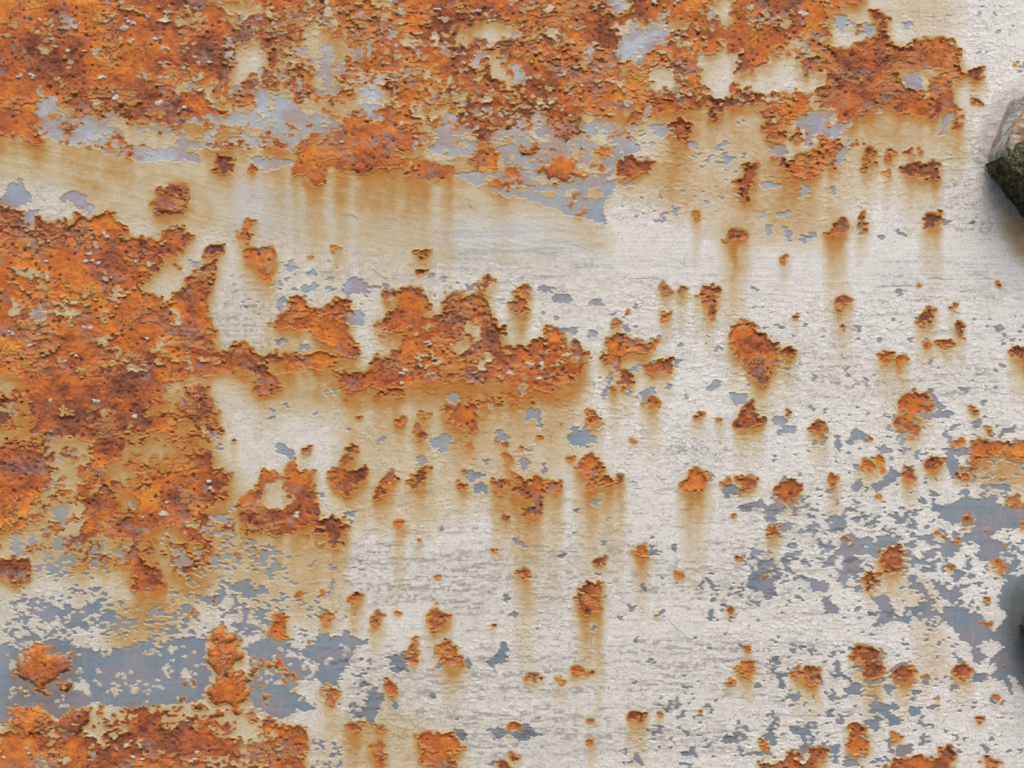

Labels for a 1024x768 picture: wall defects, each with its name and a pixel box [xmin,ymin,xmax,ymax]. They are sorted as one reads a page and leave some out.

peeling [60,191,95,216]
peeling [34,0,426,172]
rust [0,0,986,283]
peeling [746,4,780,26]
rust [0,174,675,647]
rust [658,280,722,326]
rust [692,318,798,440]
rust [902,404,1024,531]
rust [0,612,315,768]
peeling [0,503,411,727]
peeling [620,389,1024,768]
rust [847,643,930,702]